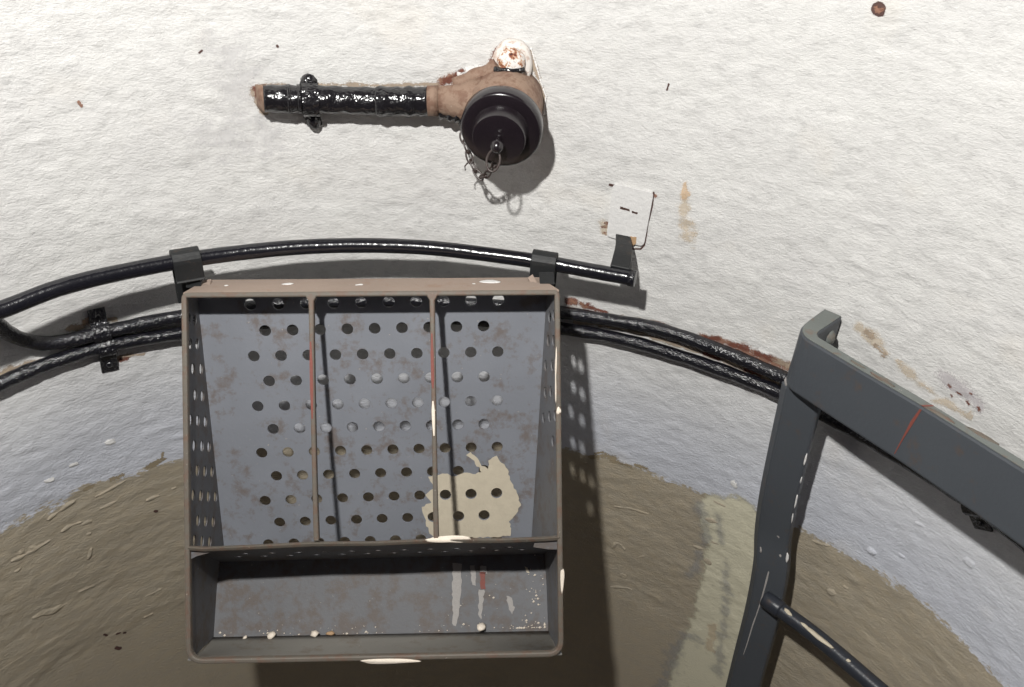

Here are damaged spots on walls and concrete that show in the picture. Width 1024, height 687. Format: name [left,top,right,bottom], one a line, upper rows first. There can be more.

corrosion [871,1,886,17]
corrosion [698,332,790,371]